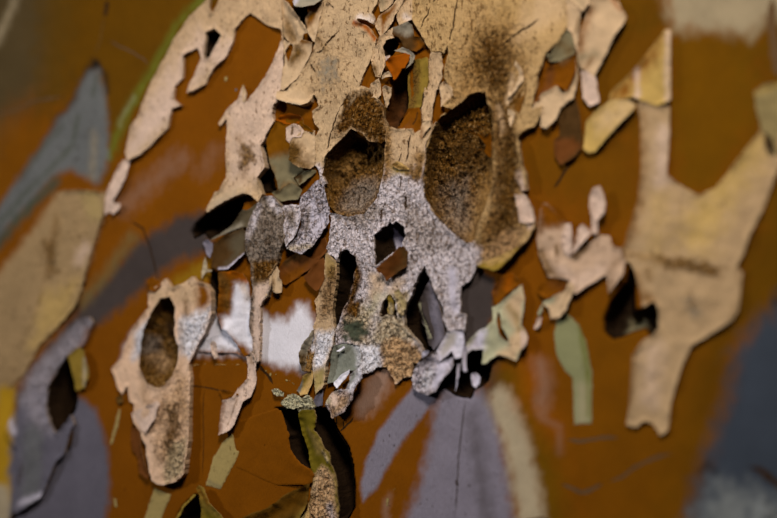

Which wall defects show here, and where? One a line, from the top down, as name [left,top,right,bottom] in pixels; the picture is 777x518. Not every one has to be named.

peeling [5,0,626,518]
peeling [534,29,777,435]